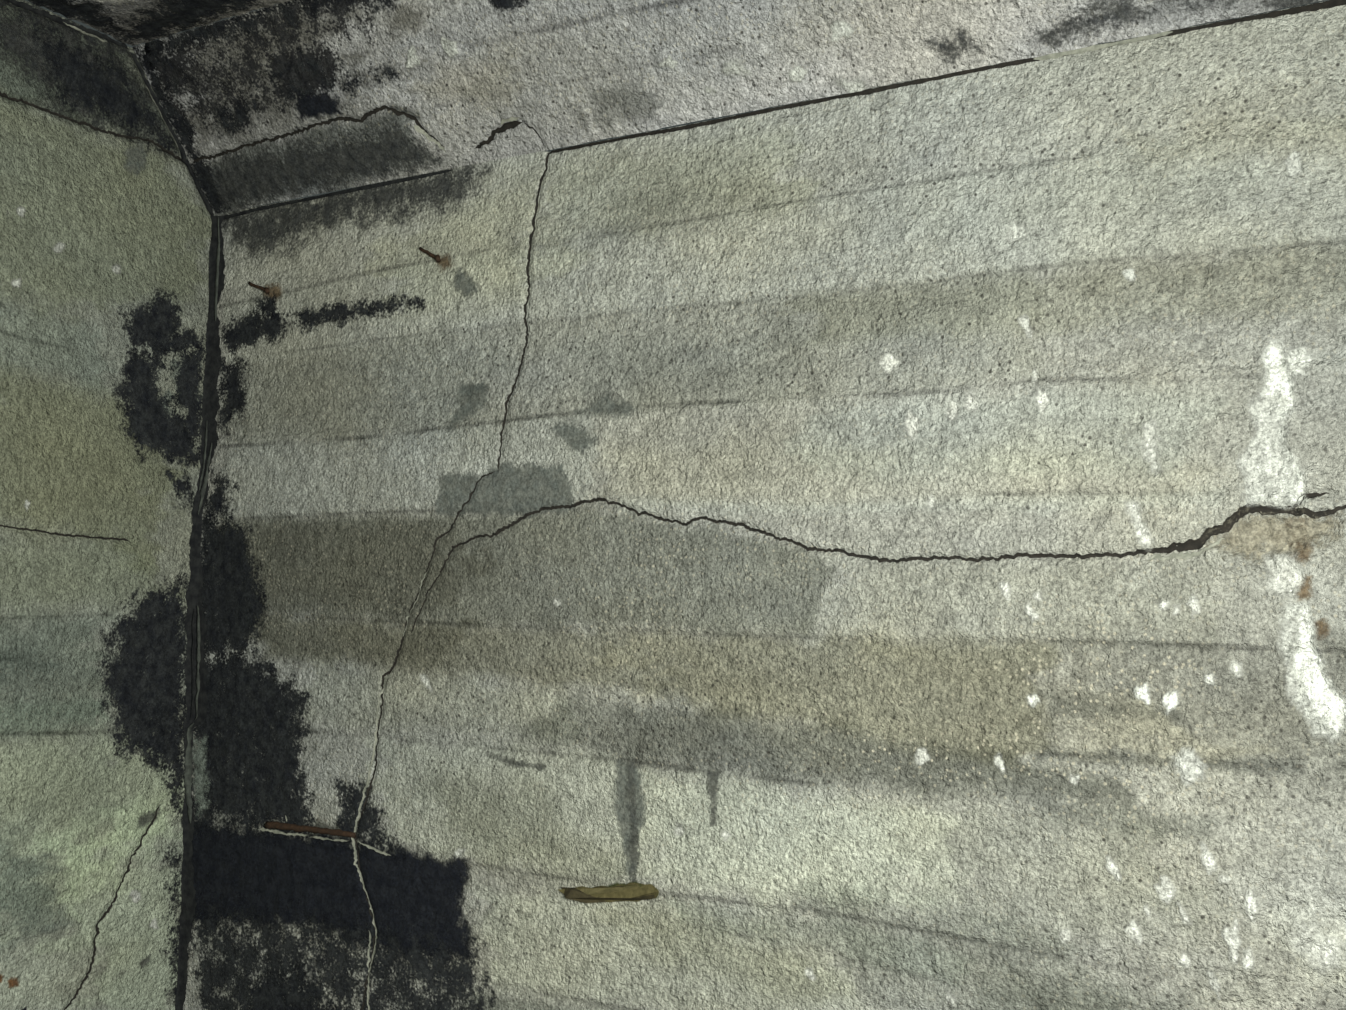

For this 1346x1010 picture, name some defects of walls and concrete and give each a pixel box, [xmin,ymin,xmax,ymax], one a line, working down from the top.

water stain [0,0,491,263]
crack [0,0,452,1010]
water stain [97,289,499,1010]
water stain [615,759,645,882]
water stain [708,771,719,825]
crack [351,0,1346,1010]